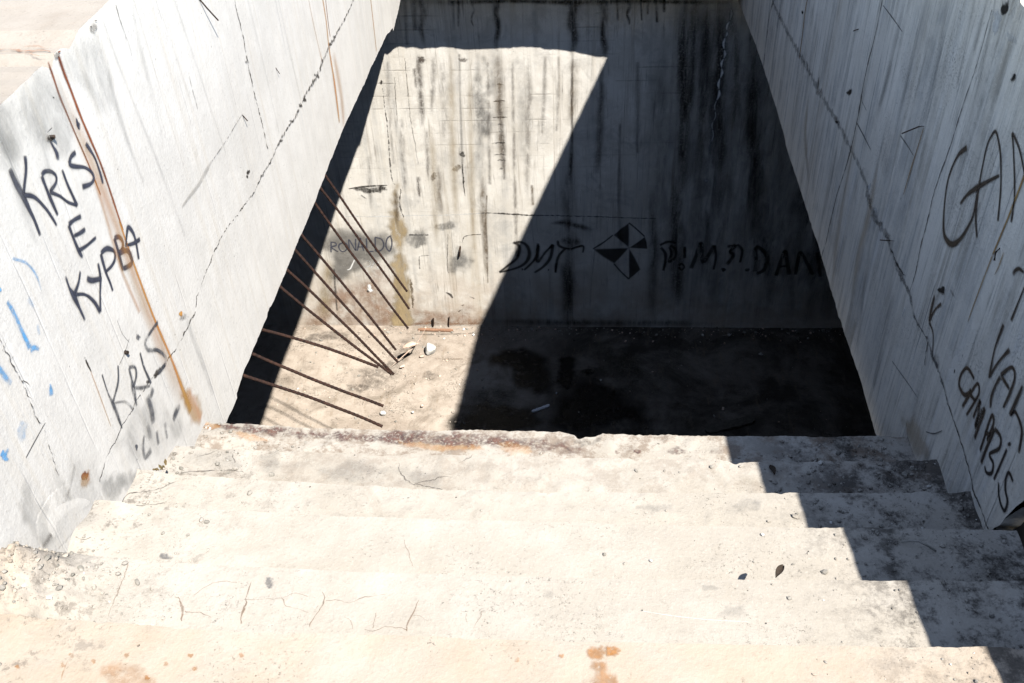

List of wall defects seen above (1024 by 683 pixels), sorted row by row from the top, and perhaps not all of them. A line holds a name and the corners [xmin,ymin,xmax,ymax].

rust [48,56,191,411]
crack [100,2,352,478]
water stain [377,193,428,326]
crack [818,3,992,529]
rust [588,647,617,658]